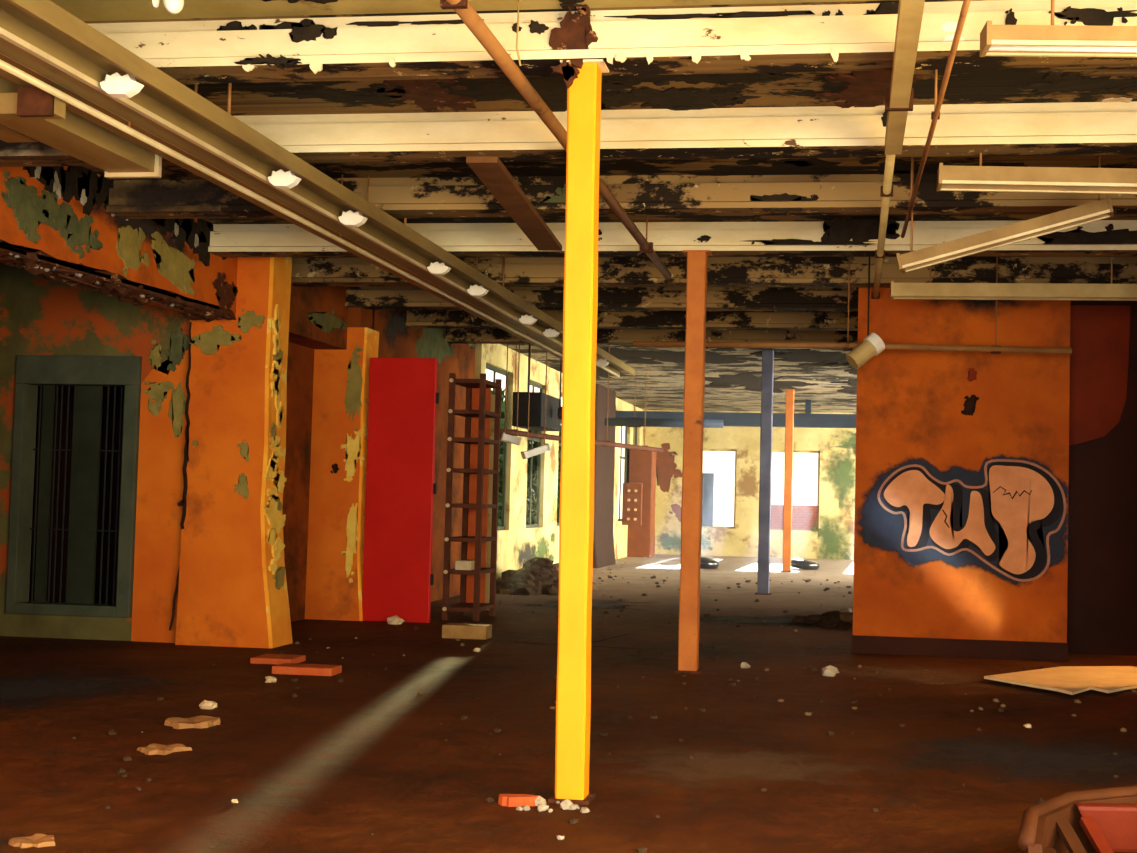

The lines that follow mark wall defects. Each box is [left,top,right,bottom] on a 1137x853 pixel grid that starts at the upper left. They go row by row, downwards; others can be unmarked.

peeling [863,2,899,15]
peeling [1005,8,1017,25]
peeling [1049,6,1137,26]
peeling [217,19,464,43]
peeling [234,54,323,74]
peeling [436,0,844,112]
peeling [672,158,1028,176]
peeling [749,193,819,213]
peeling [746,219,900,257]
peeling [1029,224,1137,254]
spalling [0,166,287,590]
peeling [705,348,857,395]